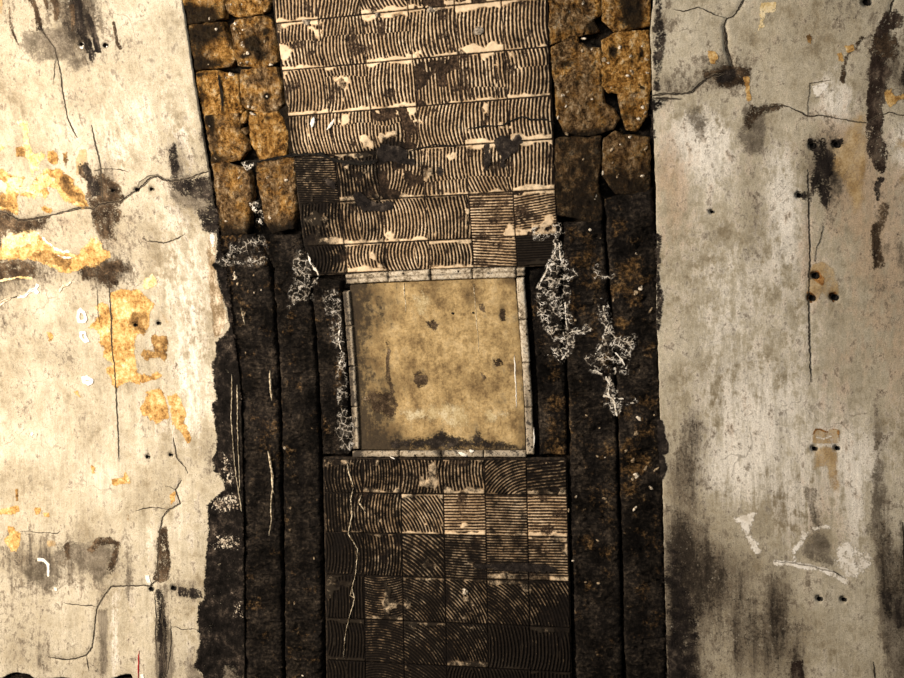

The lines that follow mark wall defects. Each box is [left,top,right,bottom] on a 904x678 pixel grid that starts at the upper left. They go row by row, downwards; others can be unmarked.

peeling [0,119,89,215]
crack [3,27,208,222]
crack [651,0,744,100]
damp [840,9,904,270]
peeling [0,230,111,292]
crack [97,275,119,458]
peeling [74,274,191,443]
damp [169,143,265,678]
damp [531,223,591,361]
damp [584,305,637,416]
crack [48,439,198,678]
damp [152,526,174,678]